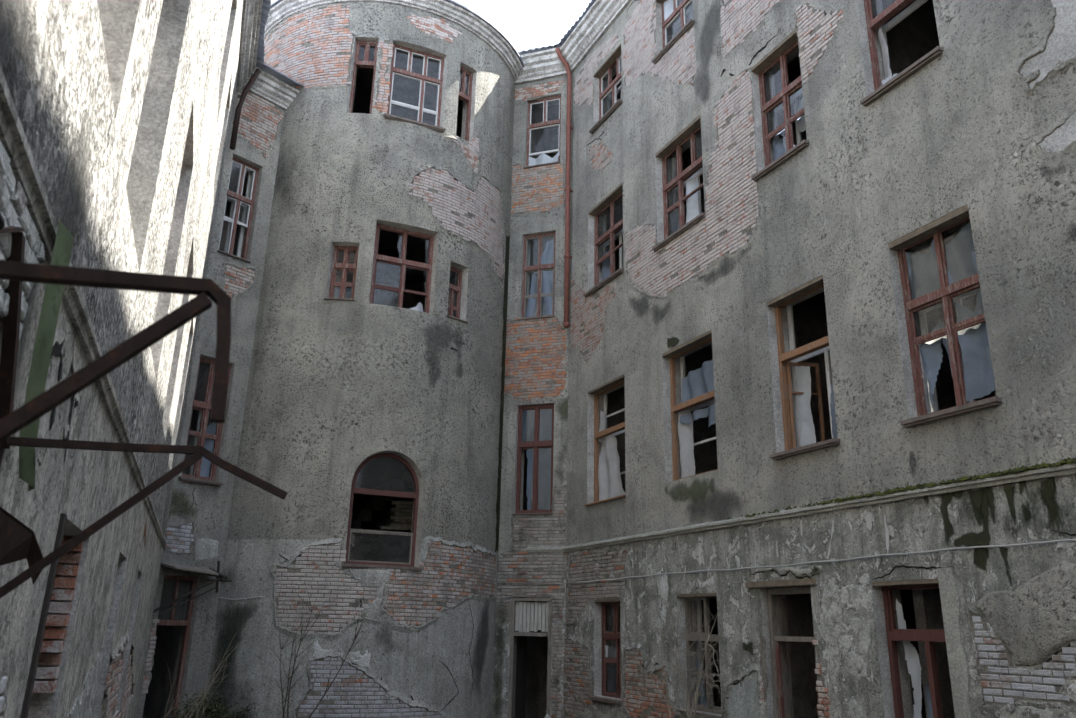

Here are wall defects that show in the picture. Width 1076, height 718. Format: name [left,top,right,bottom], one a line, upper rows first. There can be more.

spalling [264,3,358,91]
spalling [372,38,394,119]
spalling [402,12,465,46]
flaking render [1011,0,1076,98]
spalling [405,132,566,294]
spalling [504,0,846,404]
damp [426,326,462,383]
damp [688,493,739,521]
crack [1051,525,1076,539]
spalling [269,481,630,718]
peeling [812,583,872,718]
spalling [962,601,1076,718]